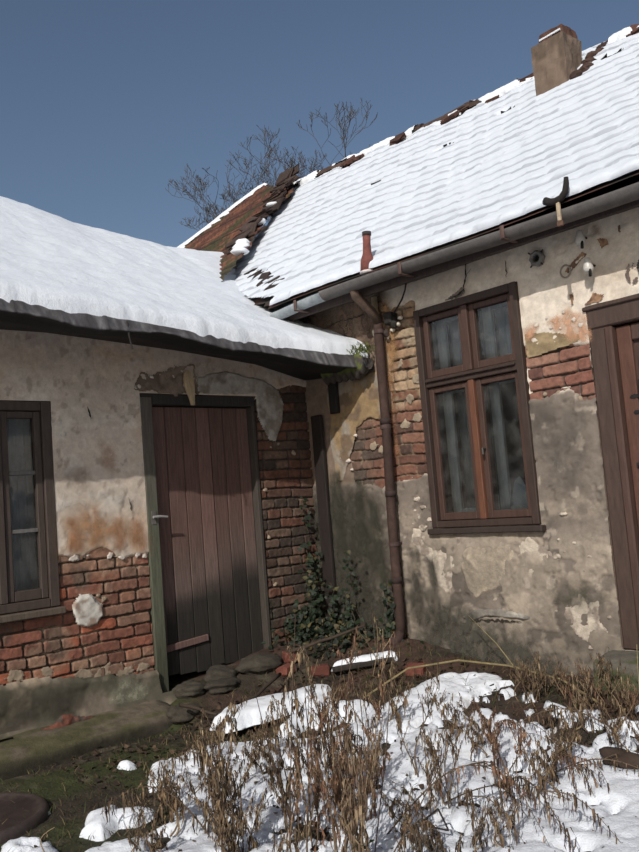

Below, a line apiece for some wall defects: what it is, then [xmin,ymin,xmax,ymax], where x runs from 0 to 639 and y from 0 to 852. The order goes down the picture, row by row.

flaking render [134,364,200,396]
flaking render [326,300,427,488]
flaking render [525,294,596,401]
peeling [585,292,604,305]
flaking render [0,547,155,686]
damp [408,550,553,675]
peeling [554,594,611,650]